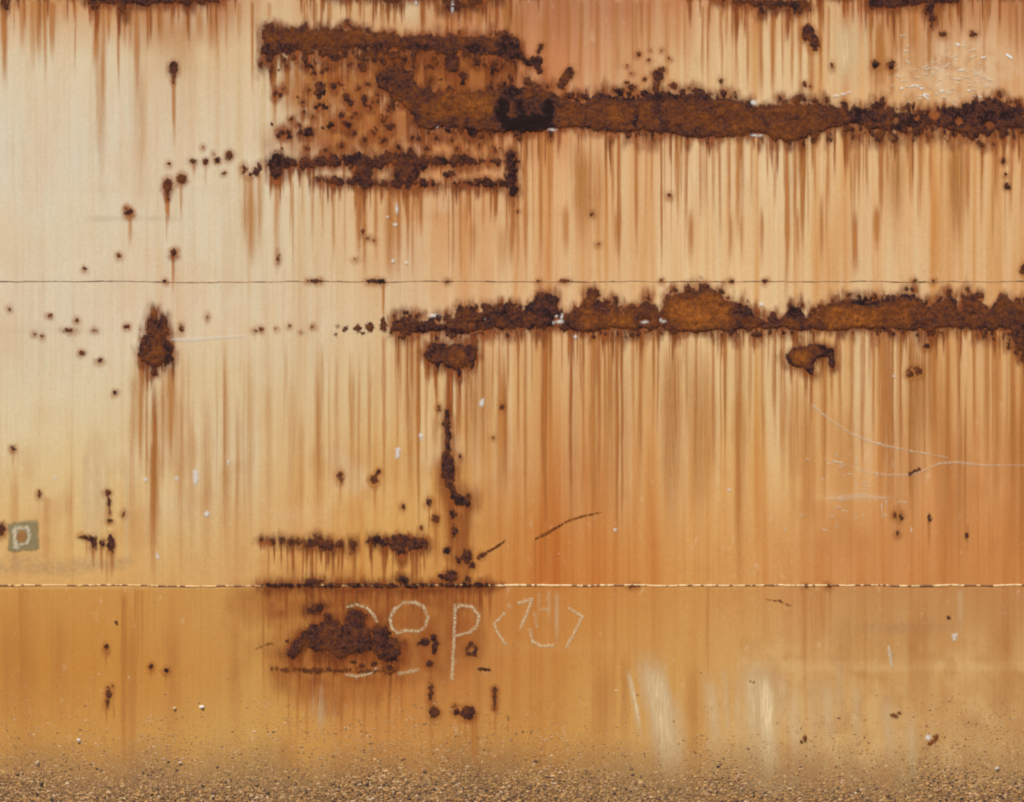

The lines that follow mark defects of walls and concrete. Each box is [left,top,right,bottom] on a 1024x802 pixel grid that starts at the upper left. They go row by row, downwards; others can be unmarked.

rust [0,0,236,81]
rust [162,146,232,216]
rust [242,0,1024,264]
rust [78,489,125,564]
rust [137,306,184,519]
rust [257,279,1024,720]